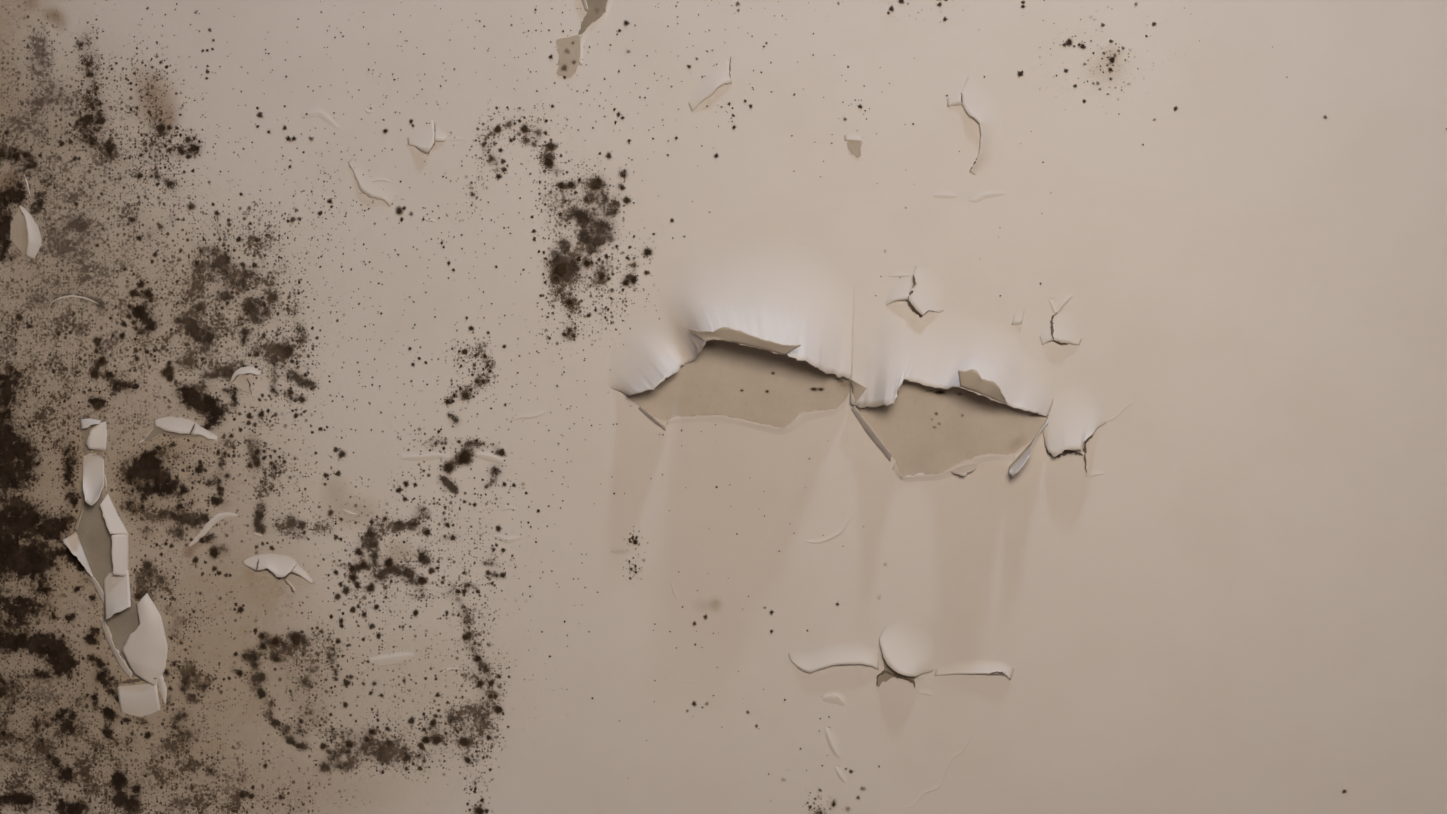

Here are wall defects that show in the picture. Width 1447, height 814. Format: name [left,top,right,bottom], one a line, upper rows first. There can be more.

peeling [557,0,614,78]
mould [630,2,776,129]
peeling [947,77,1004,175]
peeling [348,158,396,207]
peeling [10,204,45,261]
peeling [606,235,1106,482]
peeling [138,414,218,443]
water stain [0,2,660,814]
peeling [63,418,168,717]
peeling [242,551,315,593]
peeling [788,620,1014,696]